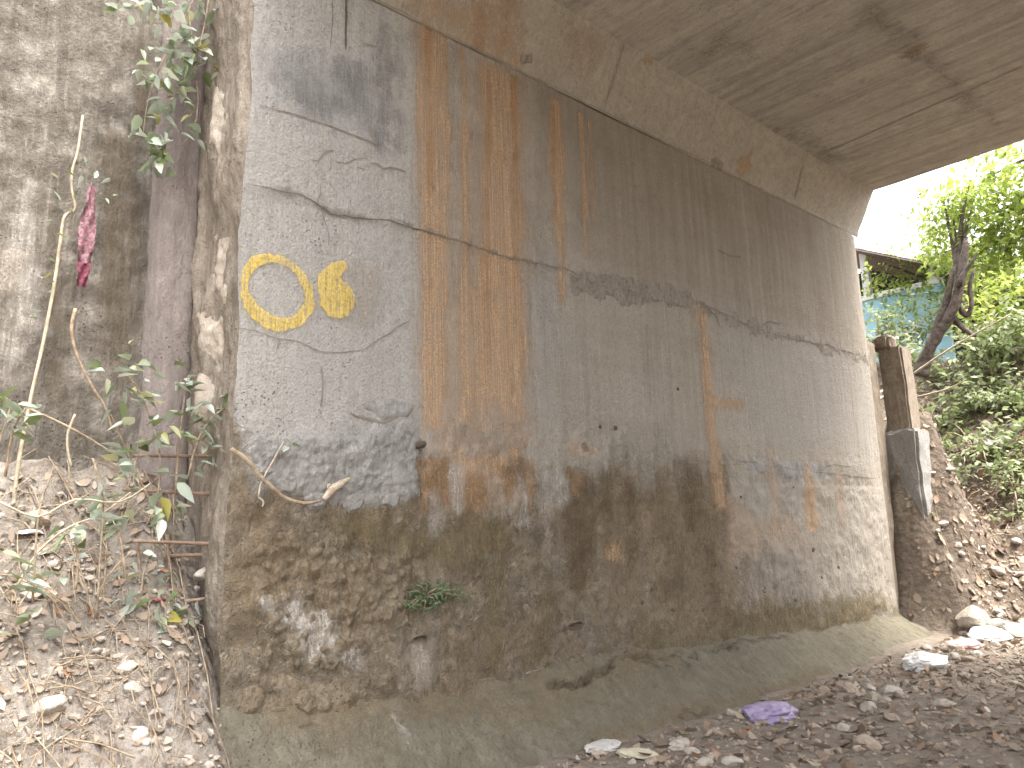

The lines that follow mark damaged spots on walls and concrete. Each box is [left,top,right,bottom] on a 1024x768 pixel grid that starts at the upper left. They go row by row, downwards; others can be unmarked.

crack [251,105,585,276]
spalling [569,269,872,376]
crack [690,297,864,358]
corrosion [694,309,795,554]
water stain [283,591,334,664]